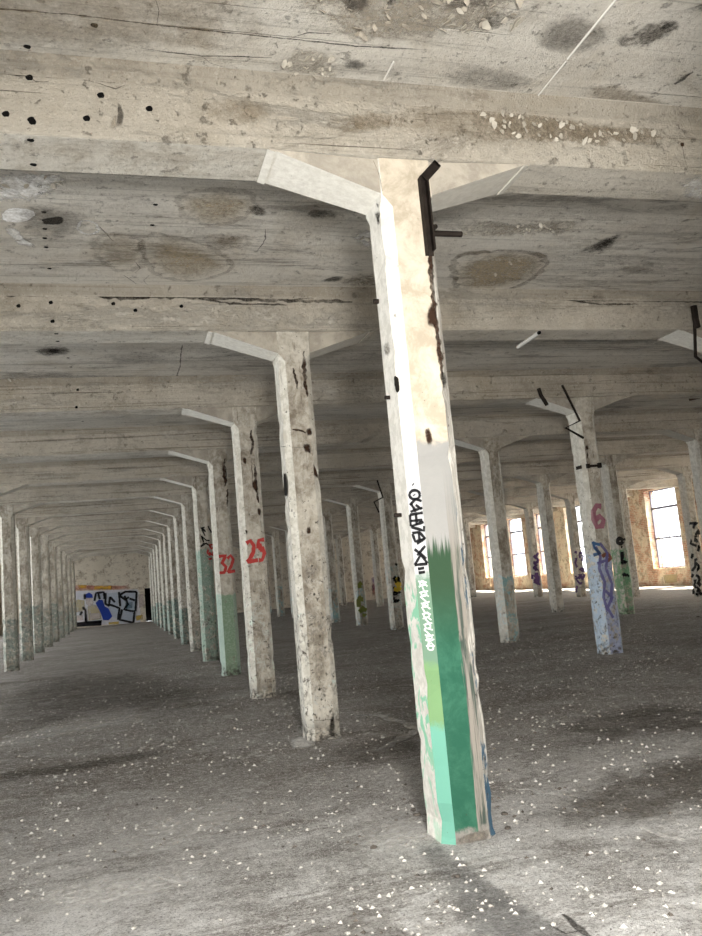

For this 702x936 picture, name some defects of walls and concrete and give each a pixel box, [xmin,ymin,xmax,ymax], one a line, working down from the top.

peeling [305,0,526,41]
leakage [634,23,672,44]
peeling [480,110,656,145]
crack [552,914,591,936]